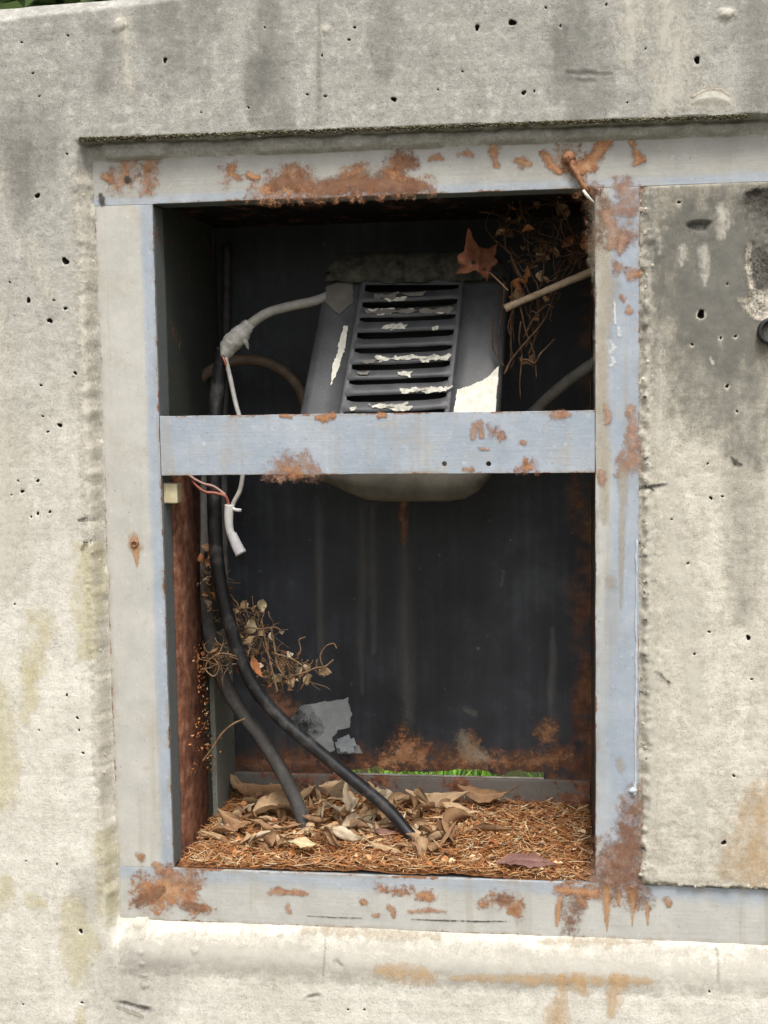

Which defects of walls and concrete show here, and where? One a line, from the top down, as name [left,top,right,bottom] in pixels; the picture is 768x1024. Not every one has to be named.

rust [102,159,158,196]
rust [223,149,444,205]
rust [515,139,646,280]
rust [265,452,321,482]
rust [470,420,507,450]
rust [597,404,643,485]
rust [346,718,573,774]
rust [128,854,212,919]
rust [270,886,309,914]
rust [360,885,447,919]
rust [478,891,526,921]
rust [554,785,652,934]